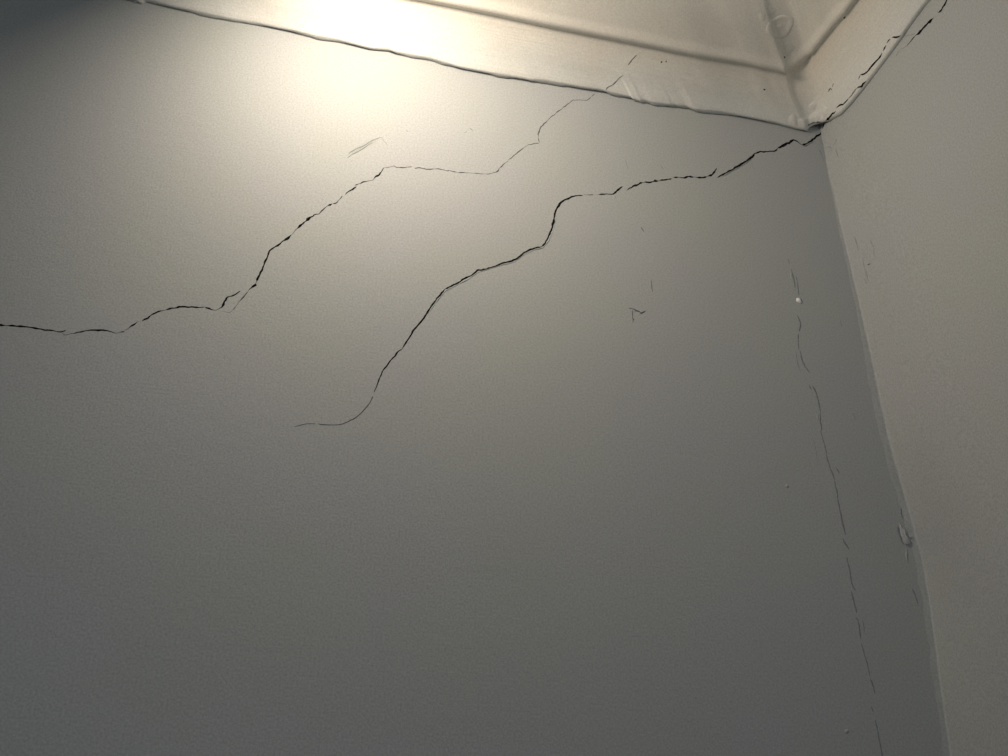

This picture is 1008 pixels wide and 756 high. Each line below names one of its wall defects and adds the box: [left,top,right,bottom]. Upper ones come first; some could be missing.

crack [0,56,636,335]
crack [298,0,947,426]
crack [788,259,883,756]